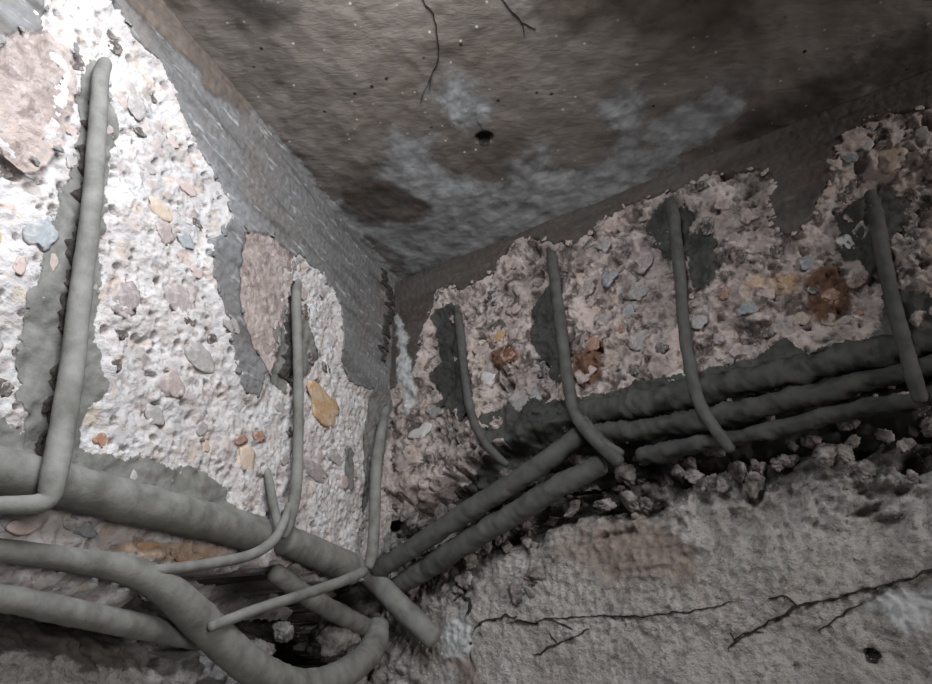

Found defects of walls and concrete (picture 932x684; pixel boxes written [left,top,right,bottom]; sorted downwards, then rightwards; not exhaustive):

crack [421,0,439,100]
crack [503,0,536,31]
damp [268,76,746,283]
spalling [0,0,389,684]
spalling [348,105,932,648]
rust [745,266,852,322]
crack [453,589,737,684]
crack [727,568,932,649]